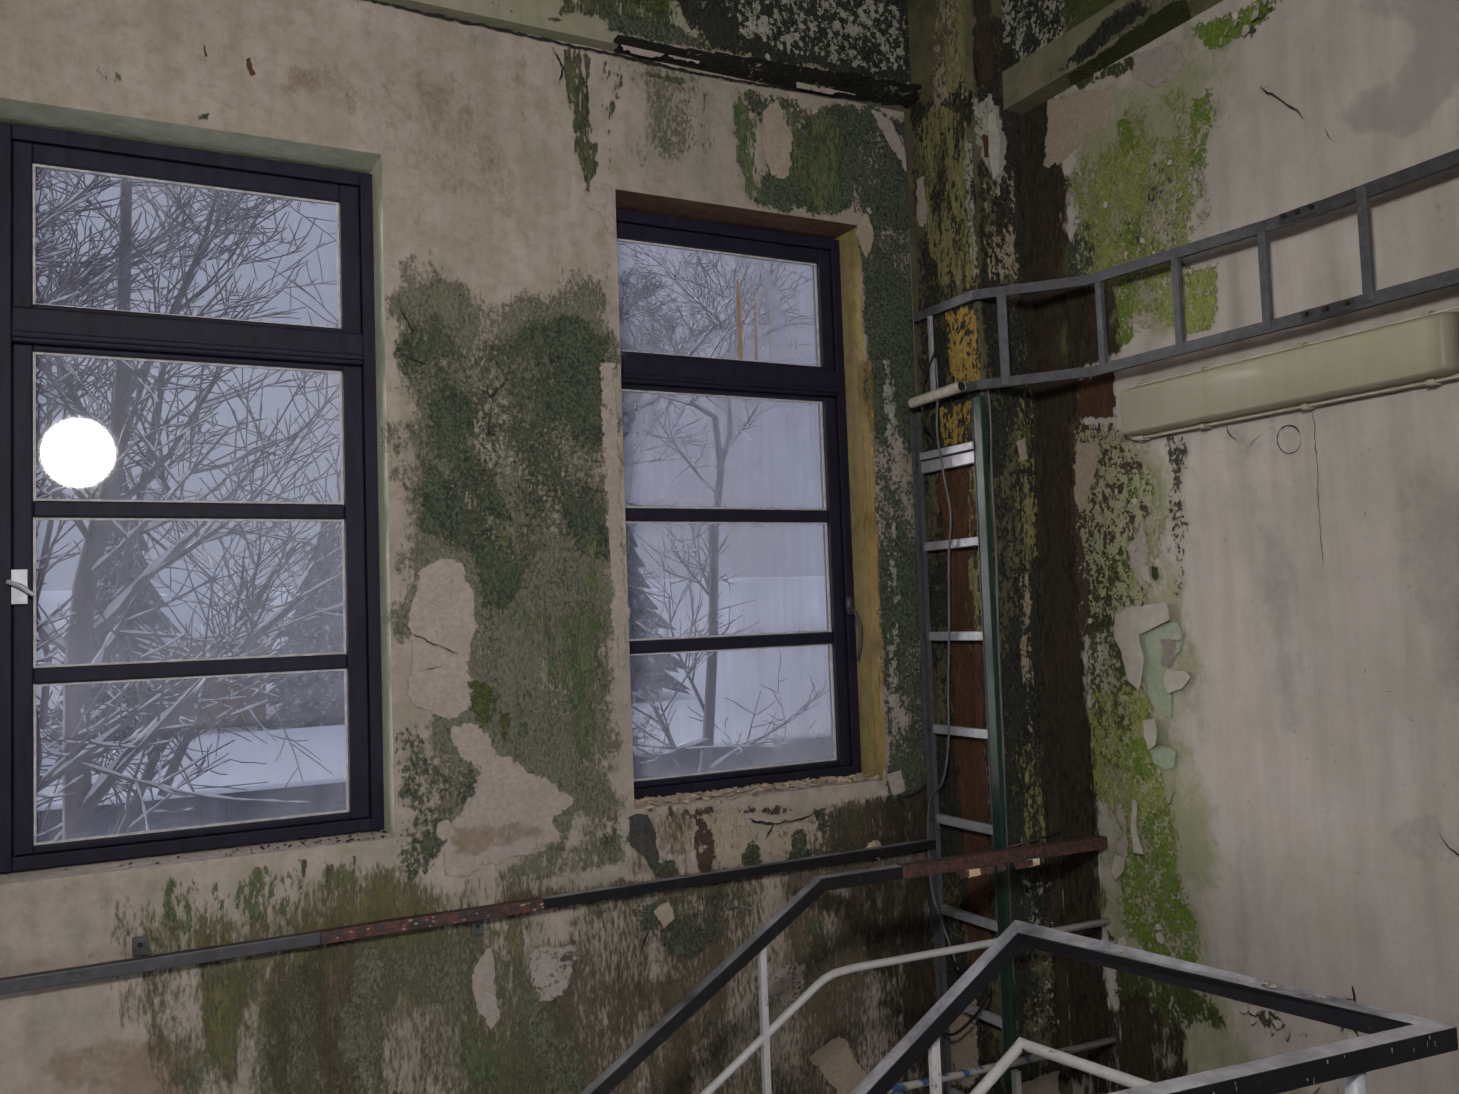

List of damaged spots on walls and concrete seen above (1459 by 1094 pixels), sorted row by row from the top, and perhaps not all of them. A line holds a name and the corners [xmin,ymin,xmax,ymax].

peeling [406,558,574,877]
damp [53,0,1177,1094]
peeling [1067,417,1191,946]
peeling [472,948,500,1030]
peeling [527,944,577,1004]